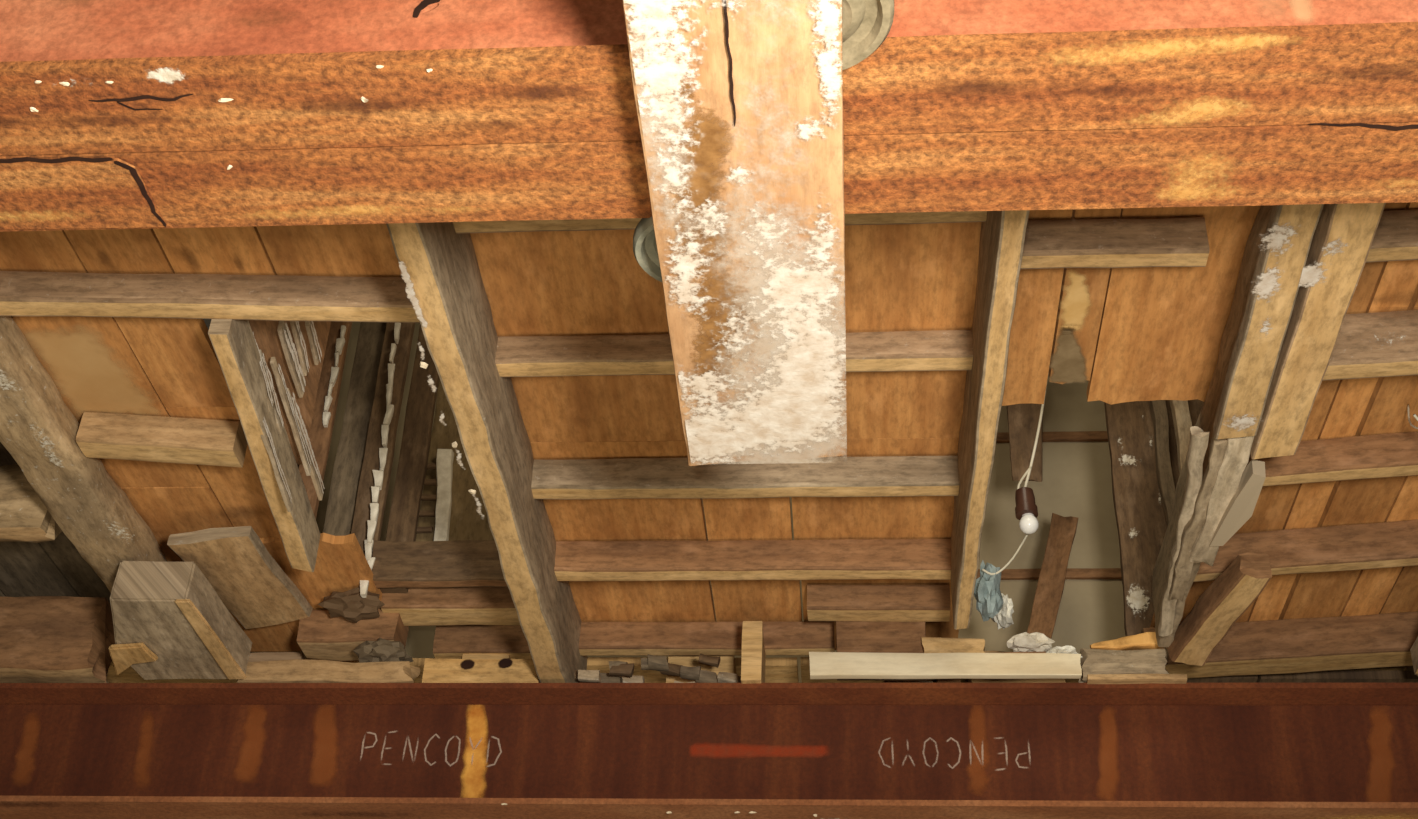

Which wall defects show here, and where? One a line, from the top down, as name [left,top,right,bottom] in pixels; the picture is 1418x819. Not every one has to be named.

crack [724,0,736,127]
rust [1072,36,1285,62]
crack [89,94,193,111]
rust [1156,102,1230,123]
crack [1309,123,1418,131]
crack [0,157,166,227]
rust [318,206,379,214]
damp [670,80,752,377]
rust [1161,160,1225,198]
peeling [1061,272,1090,330]